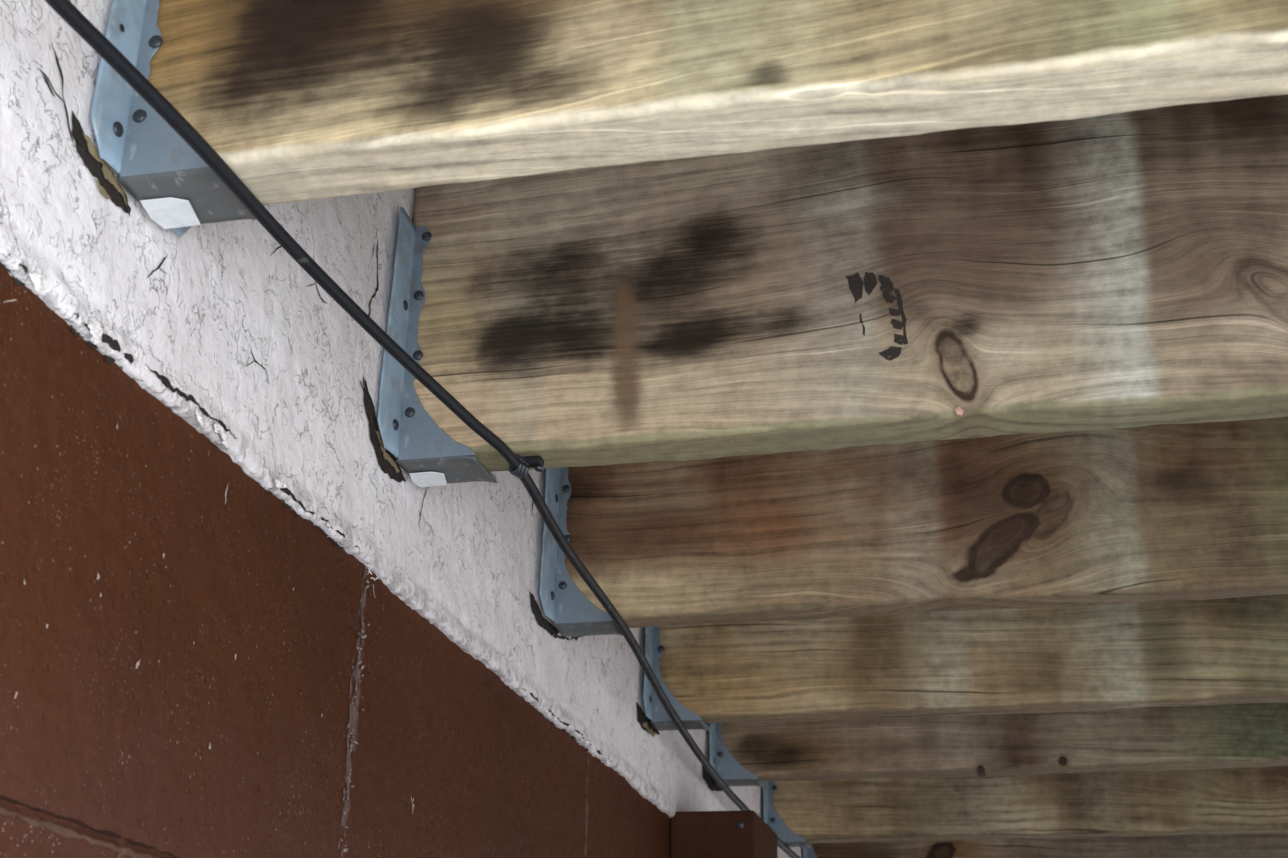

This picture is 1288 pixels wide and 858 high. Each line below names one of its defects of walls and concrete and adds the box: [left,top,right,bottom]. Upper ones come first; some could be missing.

crack [37,43,75,147]
damp [210,0,401,113]
damp [407,6,578,118]
spalling [72,111,131,215]
damp [478,219,801,418]
spalling [70,313,238,448]
spalling [363,380,406,482]